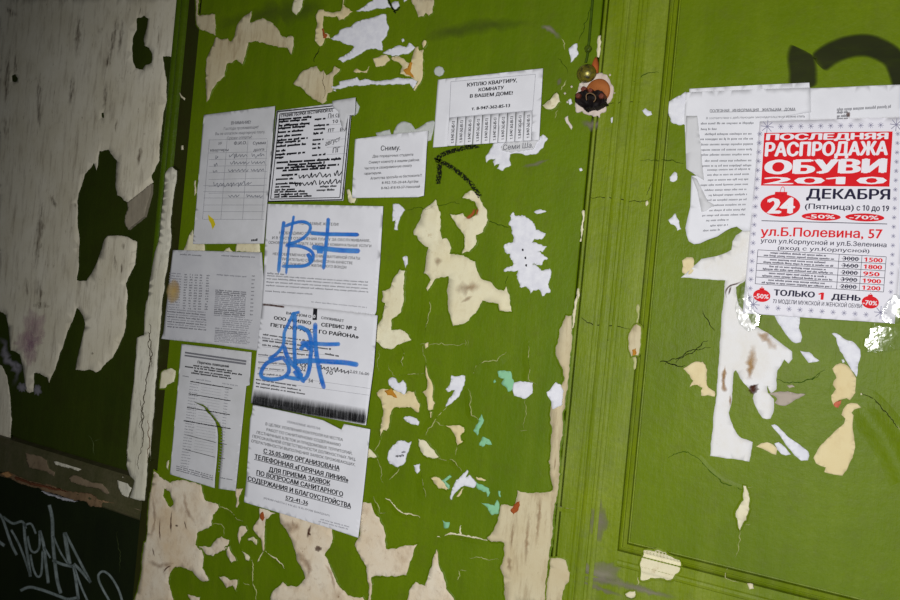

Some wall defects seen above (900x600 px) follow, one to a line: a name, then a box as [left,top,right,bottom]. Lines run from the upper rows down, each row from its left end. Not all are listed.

peeling [412,188,513,328]
peeling [0,0,456,600]
peeling [627,304,643,370]
crack [660,314,715,367]
peeling [430,475,464,497]
peeling [445,424,466,447]
peeling [485,289,580,600]
crack [668,451,751,490]
peeling [733,484,752,532]
peeling [814,363,862,476]
peeling [624,548,683,599]